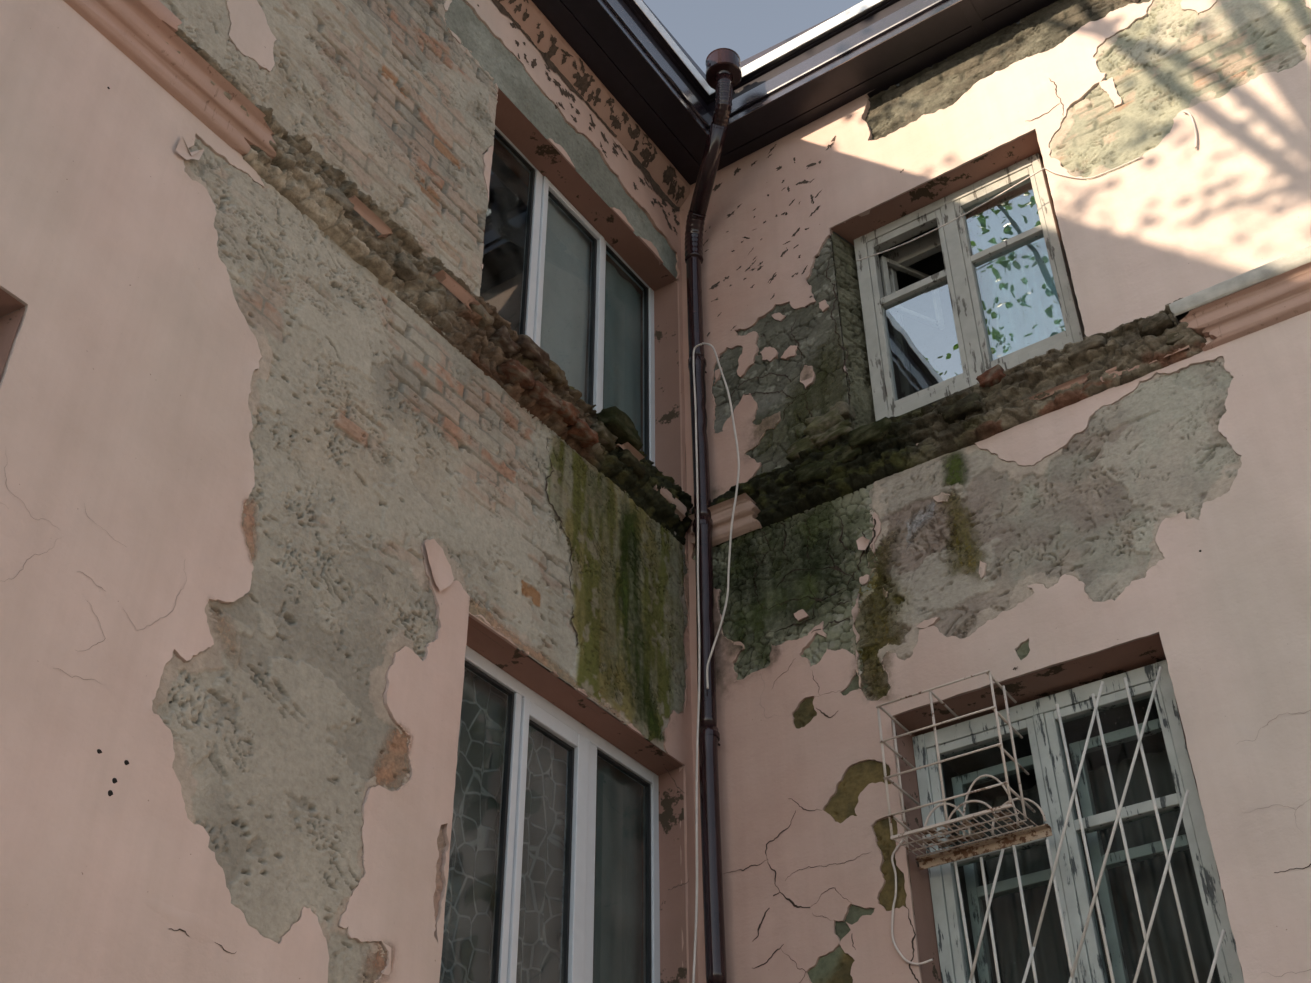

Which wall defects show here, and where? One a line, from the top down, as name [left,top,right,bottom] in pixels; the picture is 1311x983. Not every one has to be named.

spalling [1049,0,1311,180]
peeling [710,135,897,476]
spalling [1066,335,1106,361]
spalling [152,0,688,983]
damp [857,493,982,698]
spalling [841,357,1242,701]
peeling [824,760,891,823]
crack [724,798,870,981]
peeling [808,817,915,983]